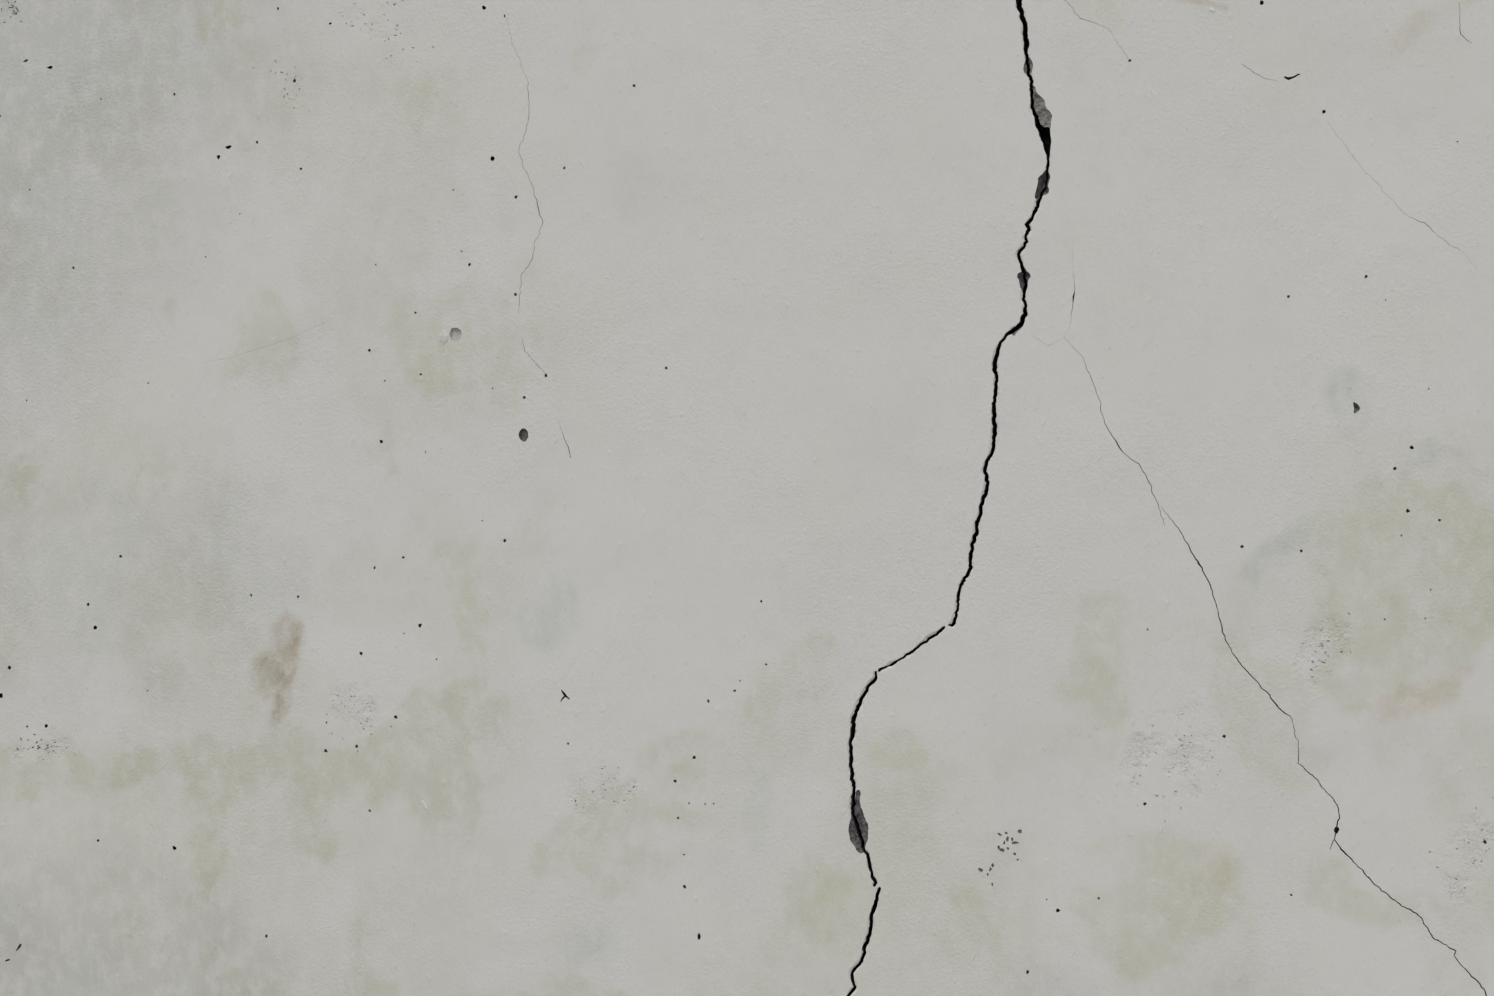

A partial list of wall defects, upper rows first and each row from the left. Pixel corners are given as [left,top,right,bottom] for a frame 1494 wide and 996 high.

crack [846,0,1487,996]